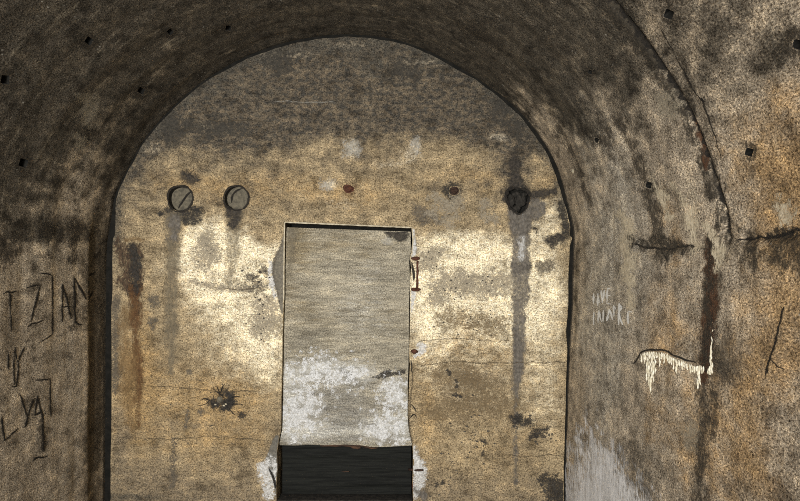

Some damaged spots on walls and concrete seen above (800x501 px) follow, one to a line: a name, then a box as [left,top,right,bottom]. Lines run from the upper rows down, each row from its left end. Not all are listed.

crack [602,0,800,274]
rust [112,237,145,405]
water stain [282,347,458,501]
water stain [501,149,653,501]
water stain [633,330,718,501]
rust [699,230,720,384]
crack [765,307,785,375]